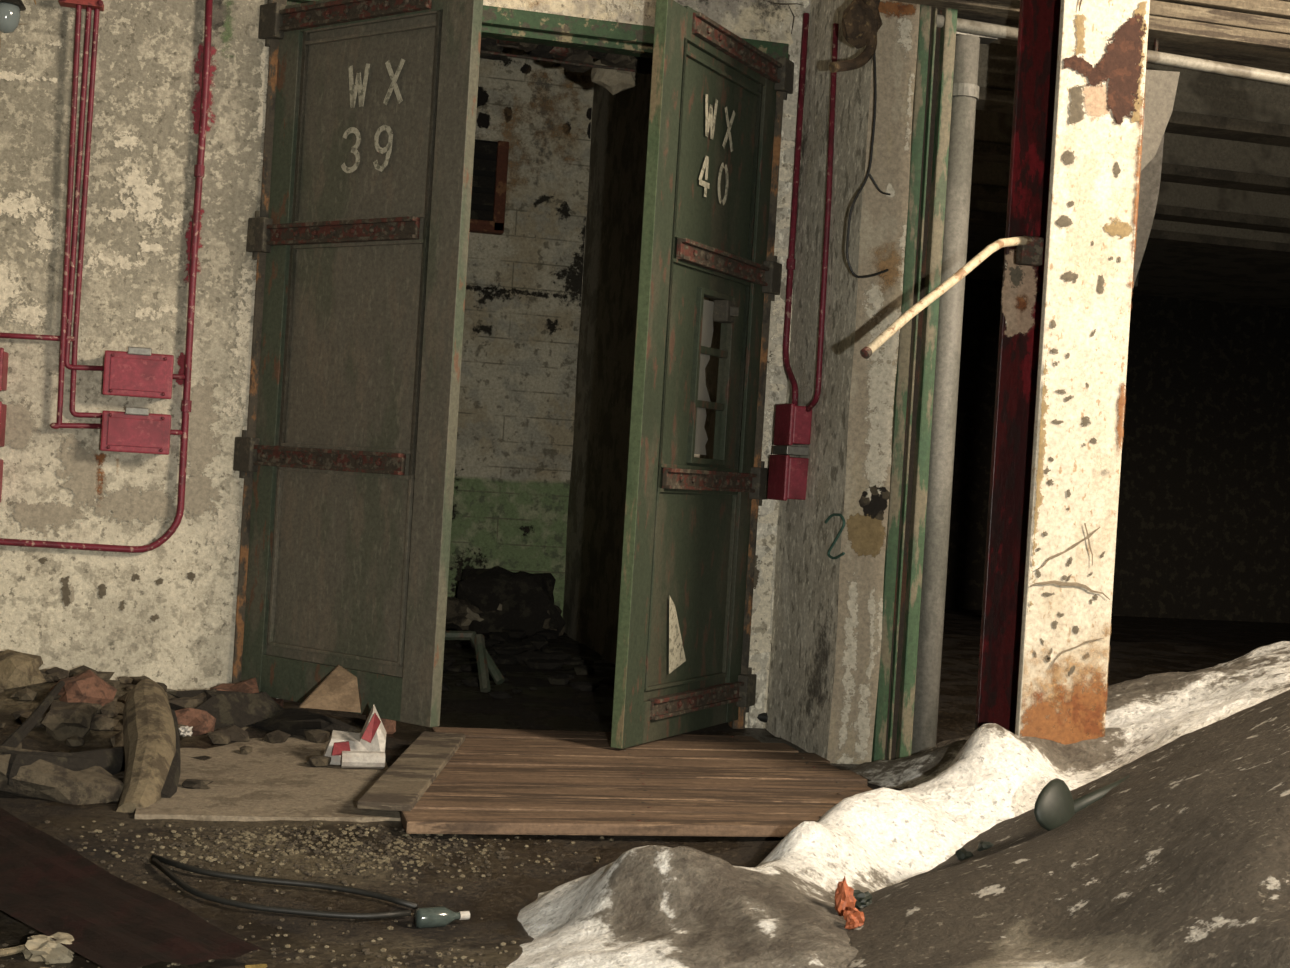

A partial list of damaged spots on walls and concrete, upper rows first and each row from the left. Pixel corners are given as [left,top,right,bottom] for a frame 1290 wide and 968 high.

peeling [1068,85,1086,126]
rust [1063,1,1147,259]
peeling [1062,150,1077,166]
peeling [1056,201,1074,229]
peeling [1092,217,1134,246]
peeling [1061,271,1078,283]
peeling [1097,275,1105,294]
rust [1117,383,1126,449]
rust [1020,649,1108,745]